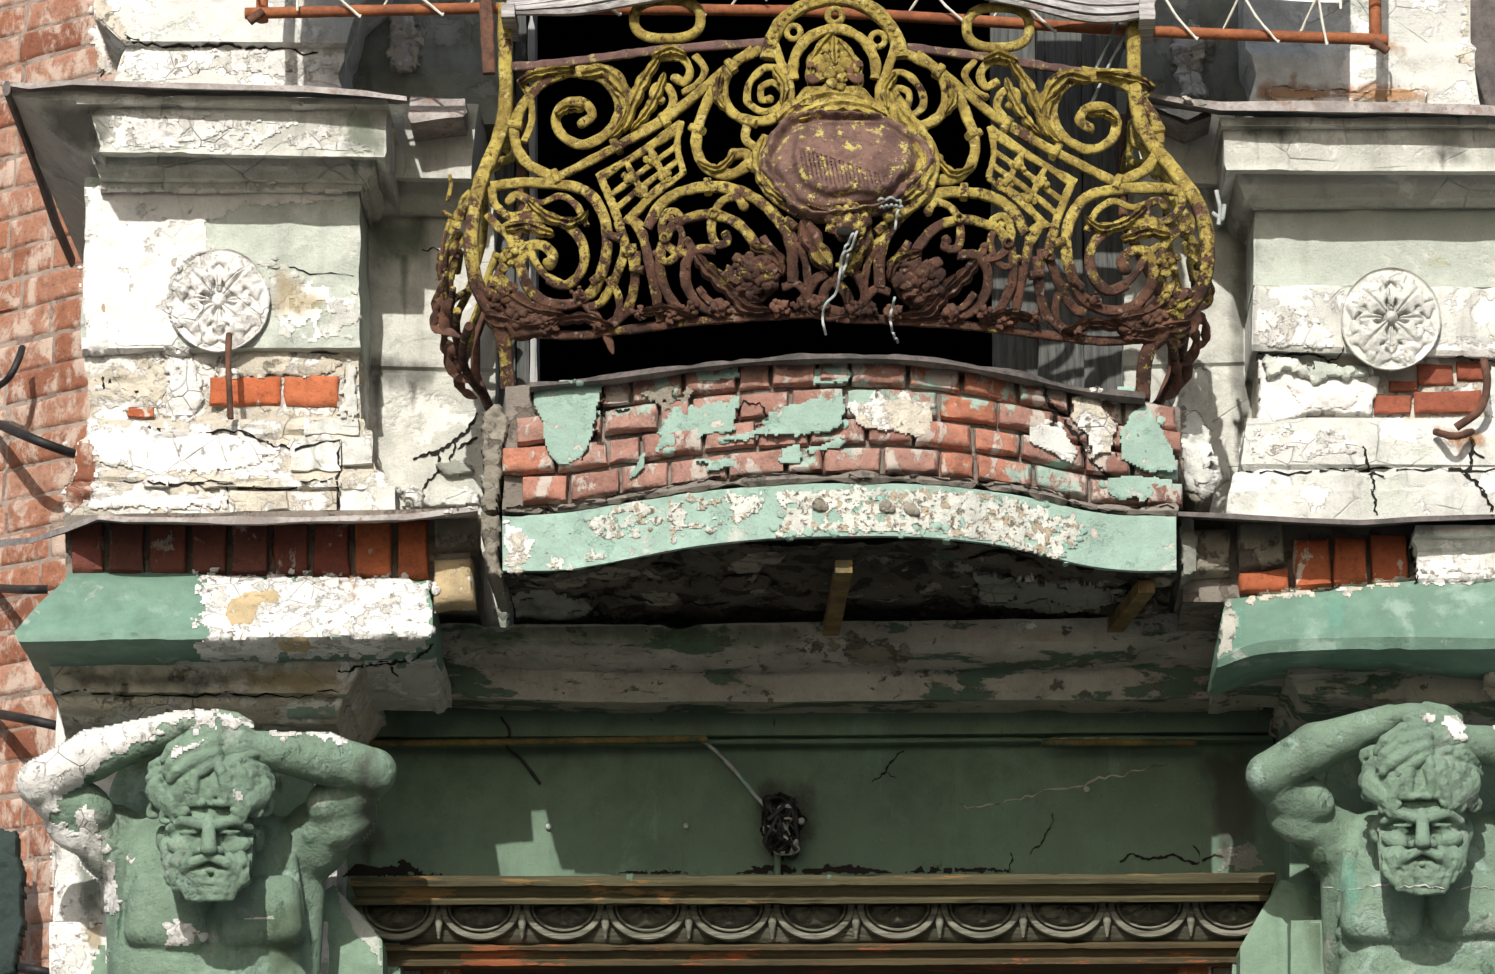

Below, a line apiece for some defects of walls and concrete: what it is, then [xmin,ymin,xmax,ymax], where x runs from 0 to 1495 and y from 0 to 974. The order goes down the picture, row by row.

flaking render [62,180,364,515]
crack [413,412,478,492]
flaking render [534,379,603,466]
peeling [396,404,1129,633]
flaking render [630,365,936,479]
flaking render [1030,364,1217,612]
crack [1246,439,1495,516]
crack [1408,527,1419,584]
peeling [191,567,441,665]
peeling [15,705,348,974]
crack [872,751,904,782]
crack [961,764,1168,870]